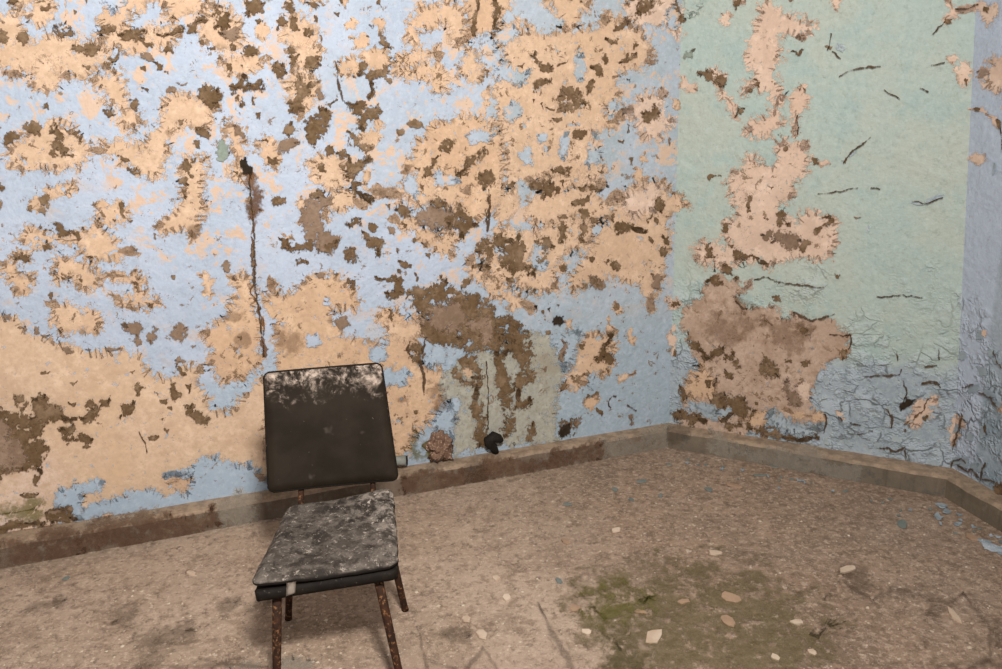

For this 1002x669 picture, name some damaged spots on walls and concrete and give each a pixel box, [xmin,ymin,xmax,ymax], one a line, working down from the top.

peeling [933,0,1002,34]
peeling [946,53,1002,149]
peeling [967,152,996,175]
corrosion [244,172,268,358]
peeling [0,0,861,569]
peeling [868,375,945,449]
crack [824,351,1002,495]